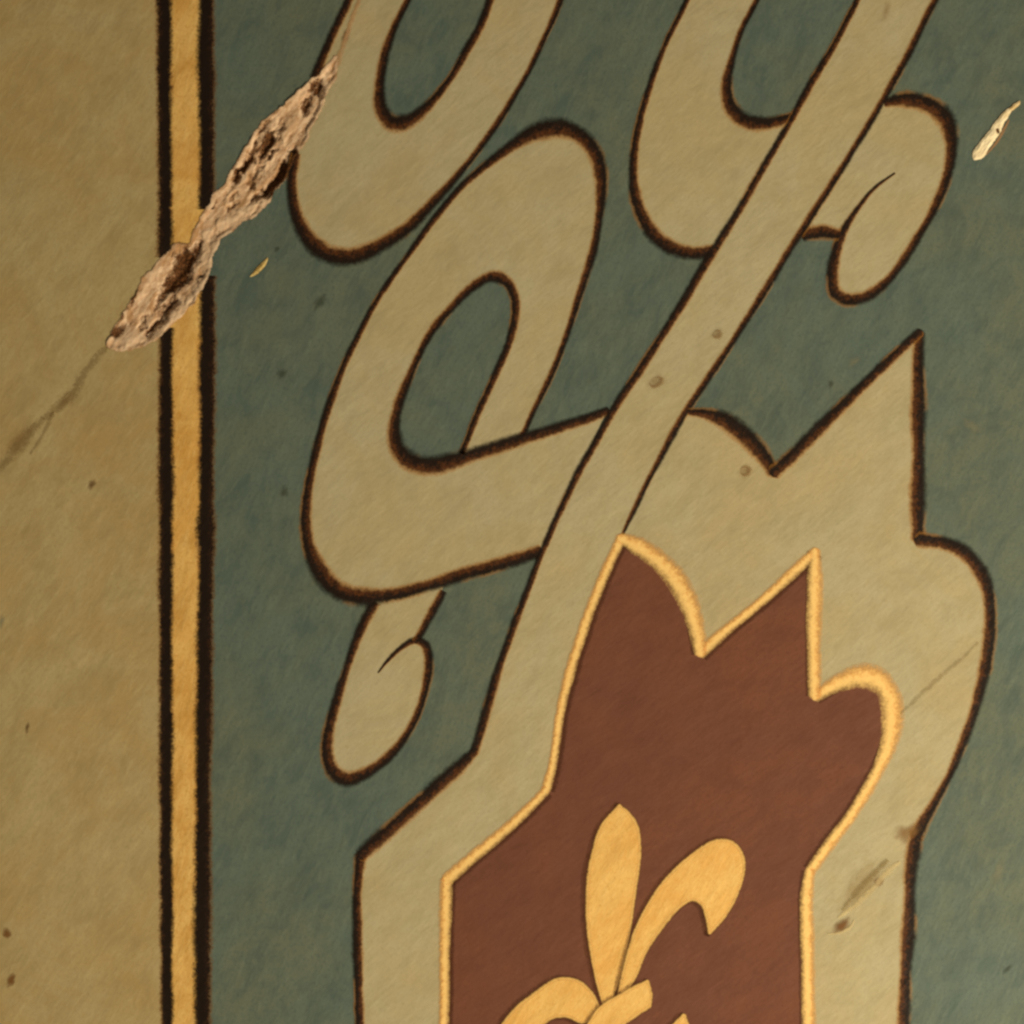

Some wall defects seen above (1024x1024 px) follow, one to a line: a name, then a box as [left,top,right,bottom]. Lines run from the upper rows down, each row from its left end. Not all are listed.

peeling [972,101,1020,160]